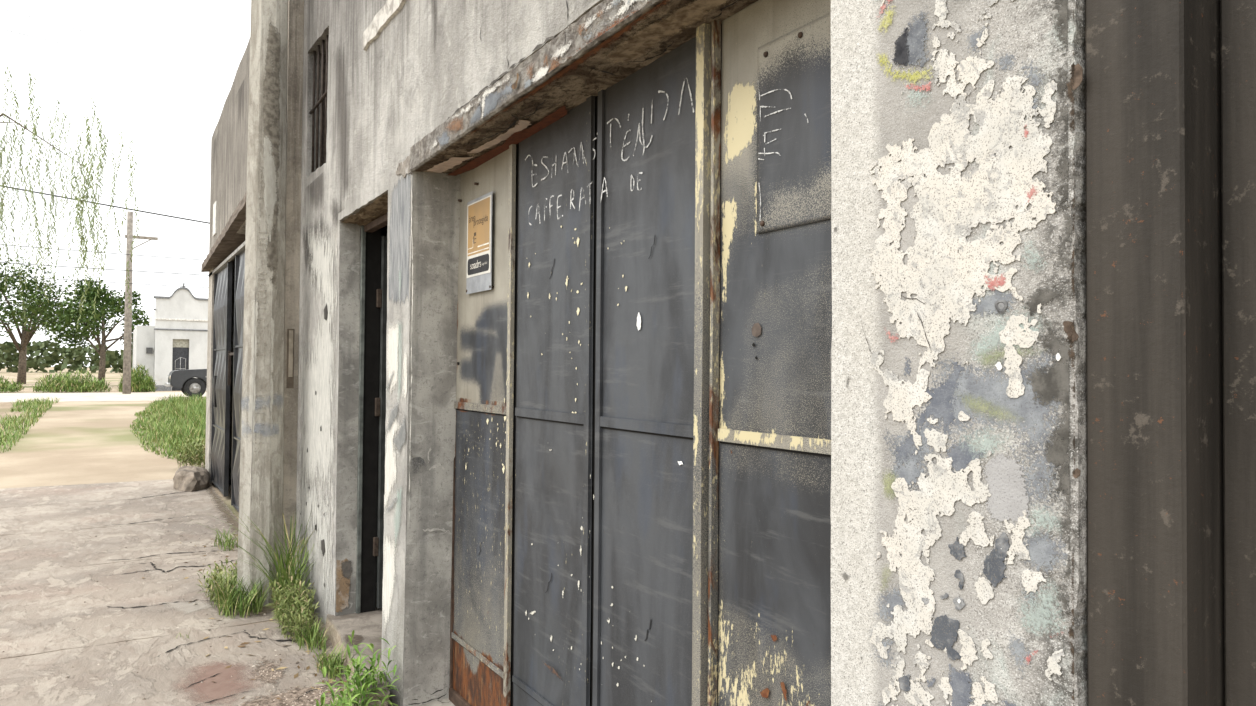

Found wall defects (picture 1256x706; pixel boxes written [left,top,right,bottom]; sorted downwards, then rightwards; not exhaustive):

peeling [583,0,647,30]
spalling [604,0,727,63]
peeling [452,40,571,118]
flaking render [396,120,532,178]
peeling [869,0,1083,706]
crack [103,560,233,576]